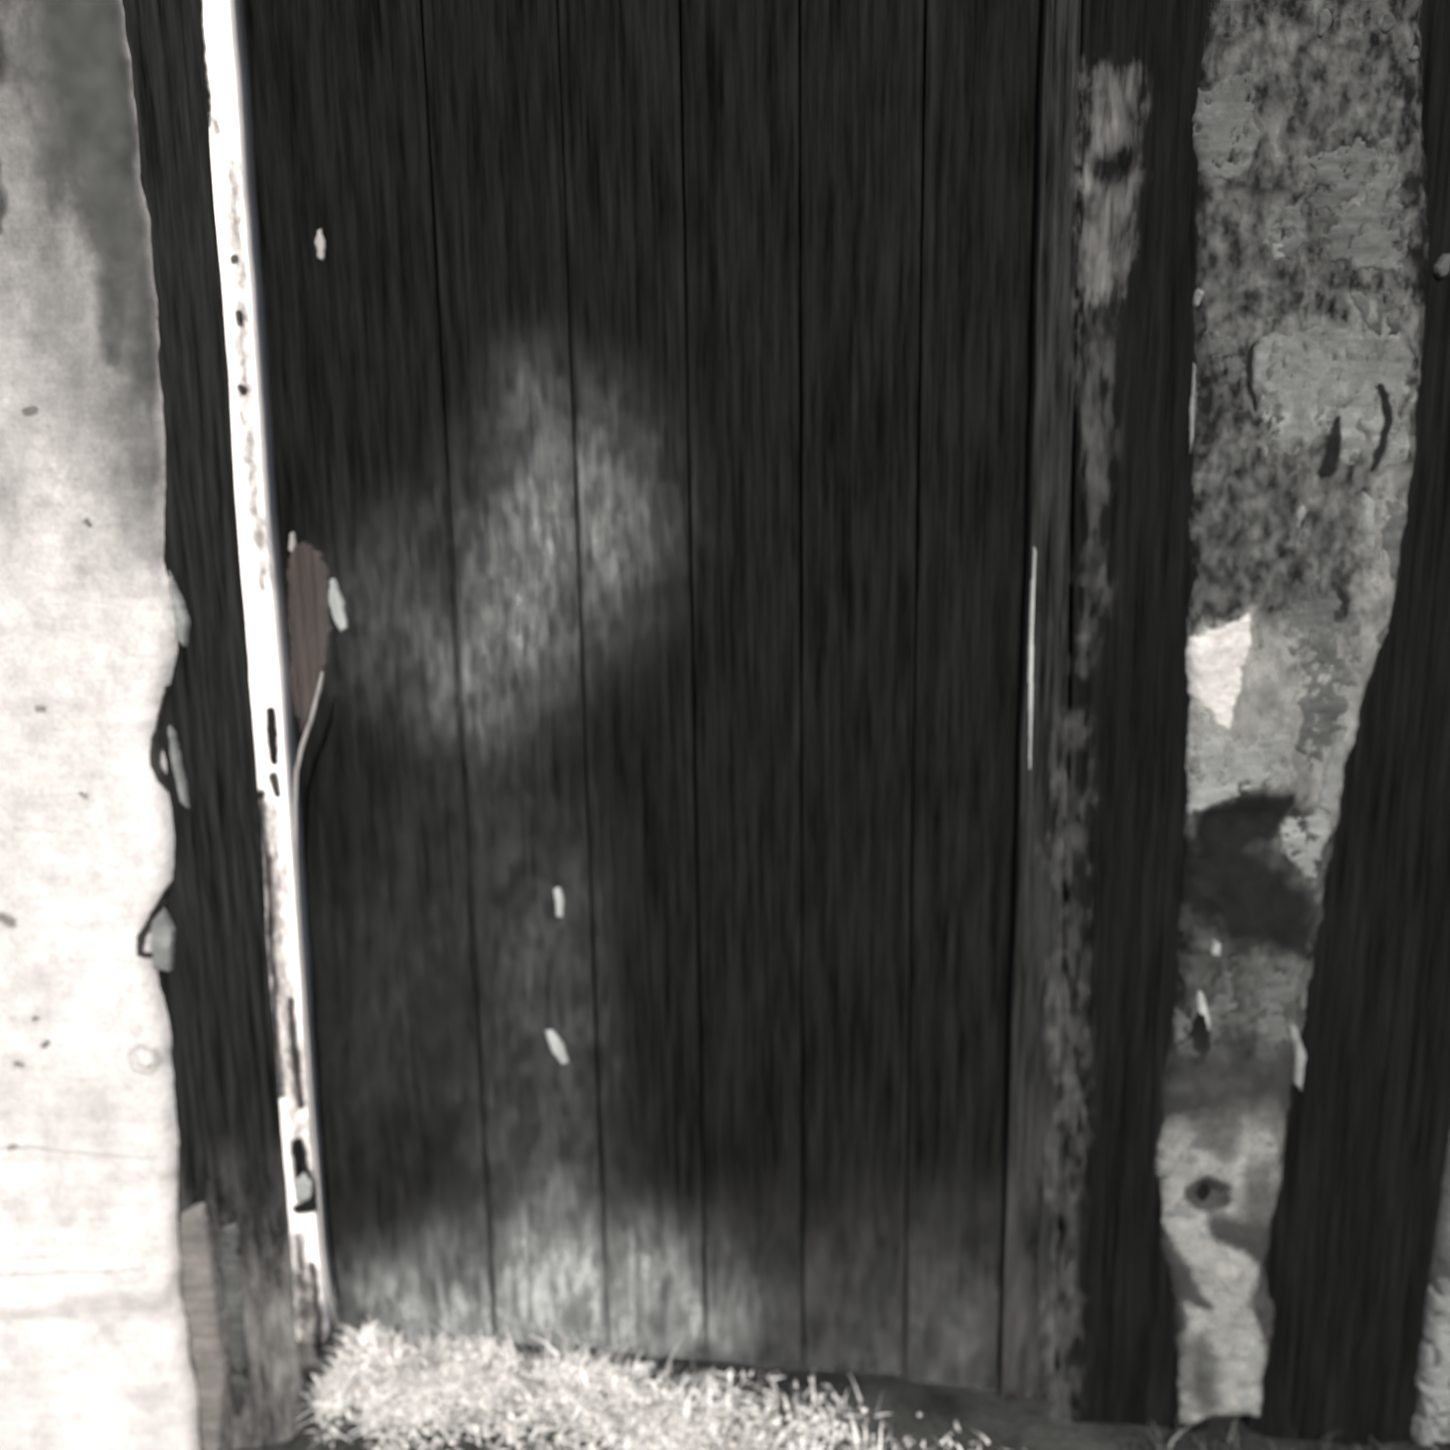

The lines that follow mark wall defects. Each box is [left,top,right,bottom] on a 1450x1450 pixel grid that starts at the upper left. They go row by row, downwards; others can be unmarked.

damp [0,0,157,512]
peeling [1156,0,1420,1424]